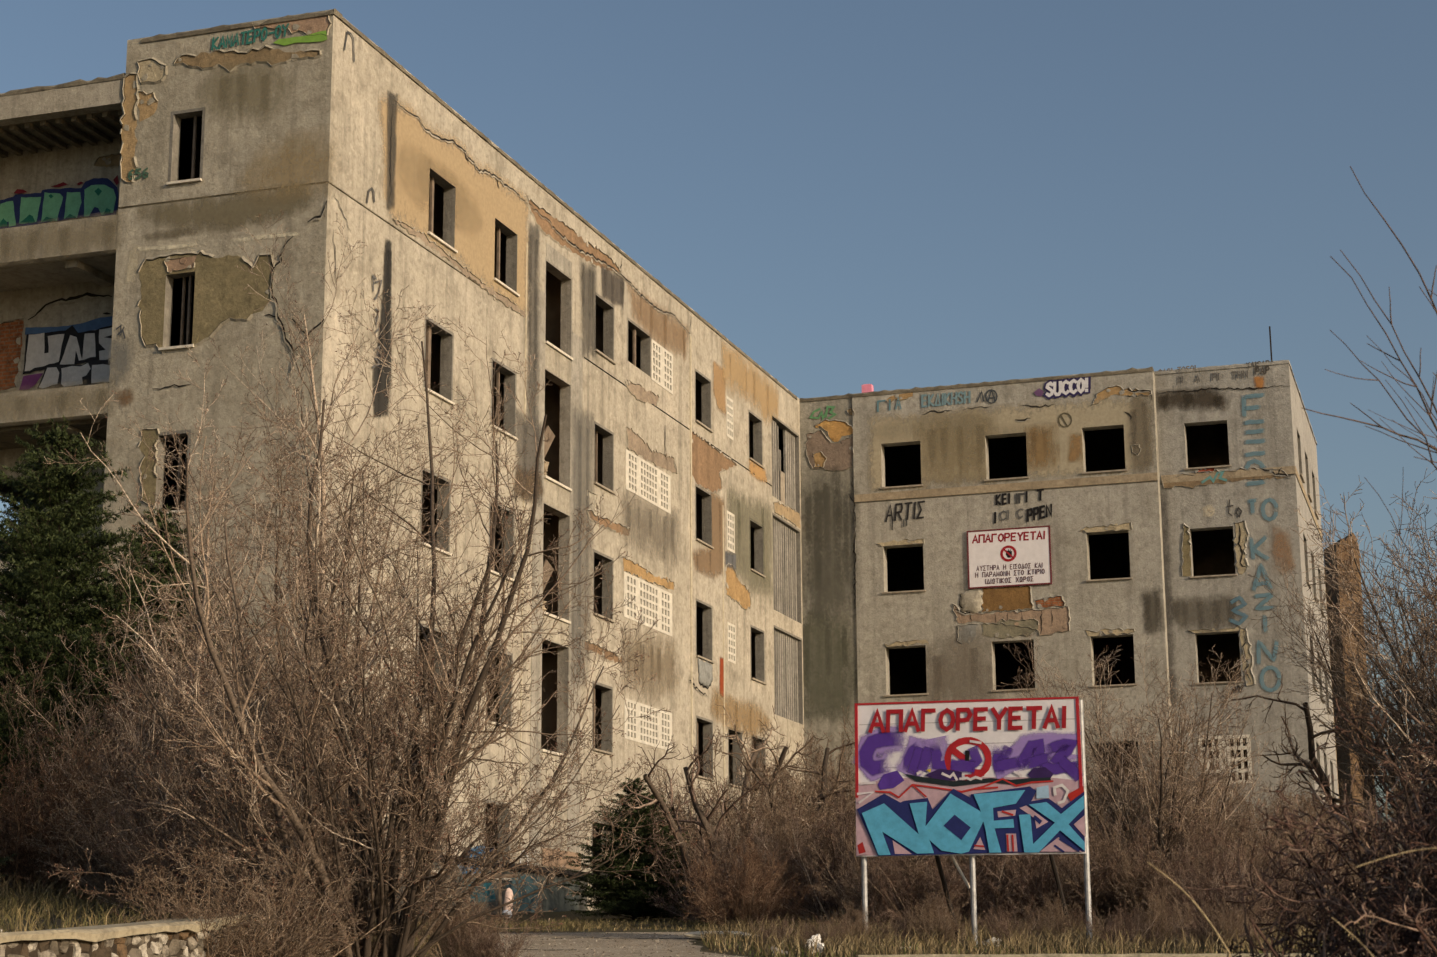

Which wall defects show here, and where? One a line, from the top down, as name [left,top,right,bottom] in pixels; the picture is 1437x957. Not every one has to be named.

spalling [94,14,332,185]
spalling [136,250,276,354]
crack [264,195,350,385]
peeling [392,218,525,318]
spalling [0,317,24,393]
spalling [138,428,160,507]
spalling [626,426,737,494]
peeling [806,408,855,471]
spalling [725,563,751,610]
water stain [803,472,856,718]
spalling [952,585,1135,637]
spalling [1232,520,1250,574]